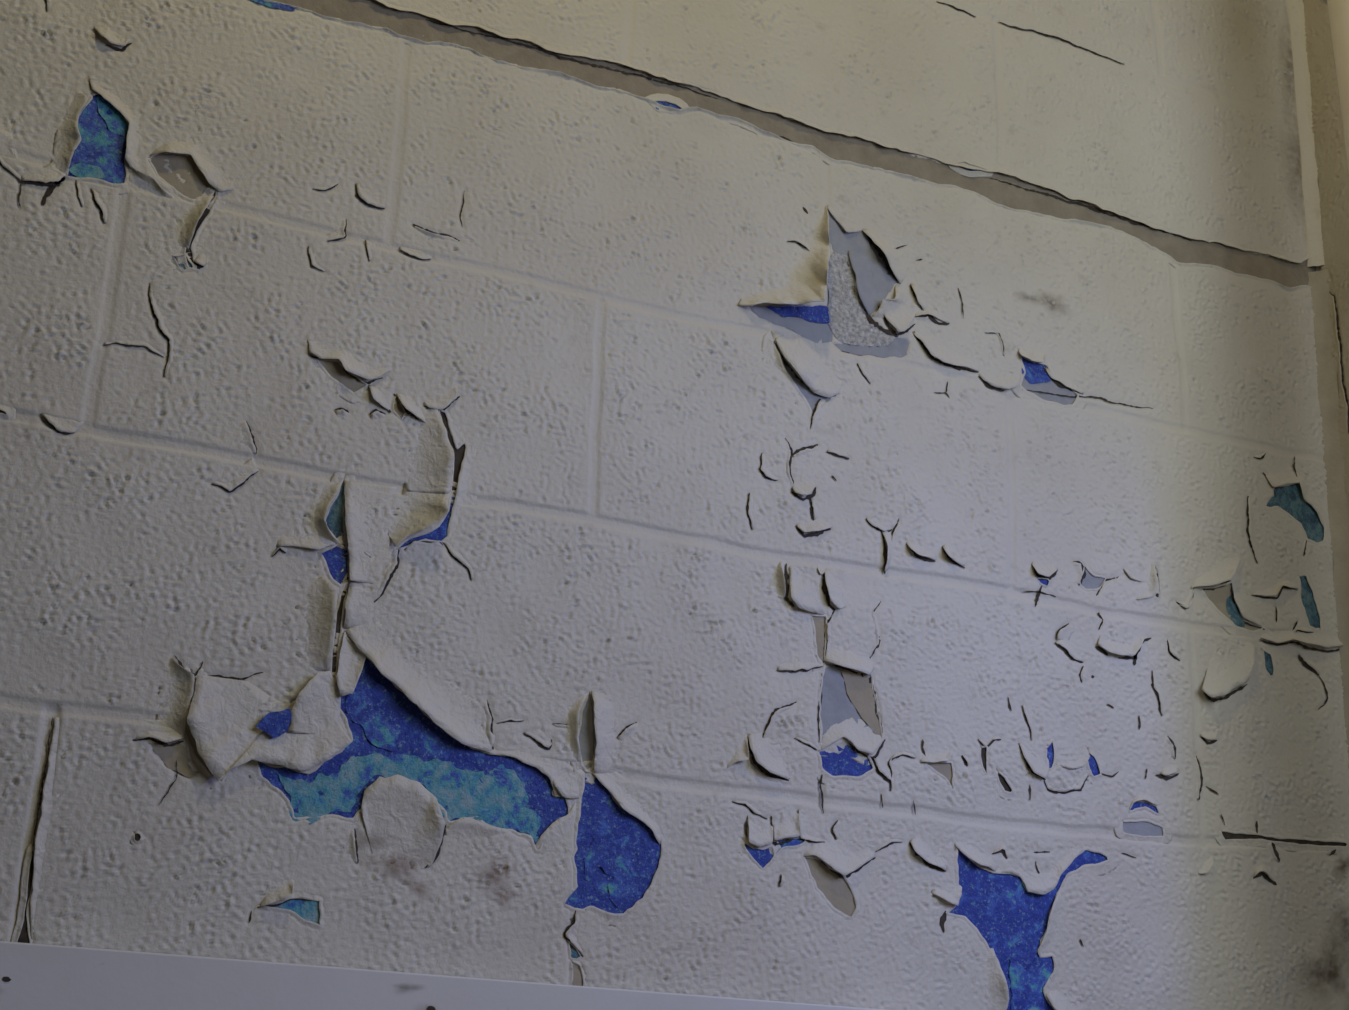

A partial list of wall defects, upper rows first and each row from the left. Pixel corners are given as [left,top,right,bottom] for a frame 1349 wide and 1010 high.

peeling [93,21,132,51]
peeling [0,76,234,277]
crack [426,19,717,99]
peeling [251,0,1316,287]
peeling [738,199,1153,409]
crack [936,0,1125,64]
crack [990,178,1192,241]
peeling [133,339,674,986]
peeling [866,510,969,574]
peeling [1176,449,1343,800]
crack [11,717,67,944]
peeling [727,557,1179,1010]